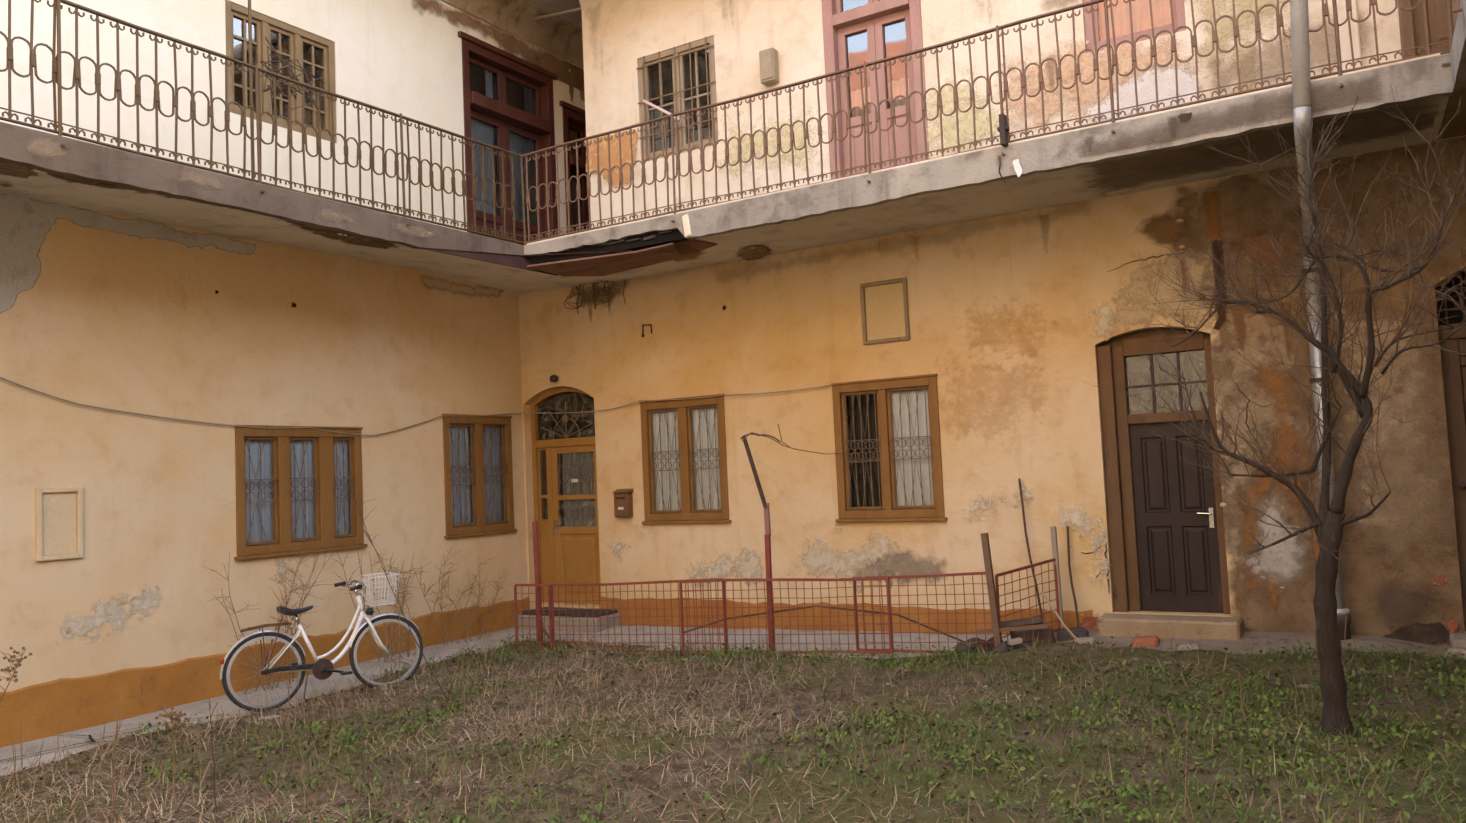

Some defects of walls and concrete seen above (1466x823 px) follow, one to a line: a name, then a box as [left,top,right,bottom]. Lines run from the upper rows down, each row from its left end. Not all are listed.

flaking render [0,193,256,313]
water stain [1142,213,1188,243]
flaking render [1171,136,1466,659]
peeling [1060,506,1114,579]
peeling [61,586,161,641]